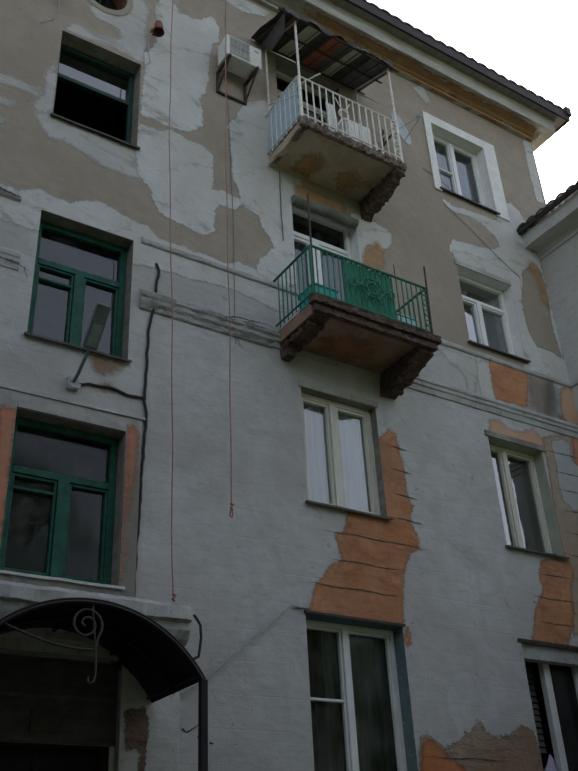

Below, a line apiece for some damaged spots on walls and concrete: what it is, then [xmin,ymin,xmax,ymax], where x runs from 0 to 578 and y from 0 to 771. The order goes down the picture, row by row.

flaking render [139,289,275,349]
peeling [522,260,561,356]
peeling [489,362,529,408]
peeling [0,407,17,546]
peeling [305,429,422,647]
peeling [489,419,578,645]
flaking render [123,706,149,771]
flaking render [418,719,543,771]